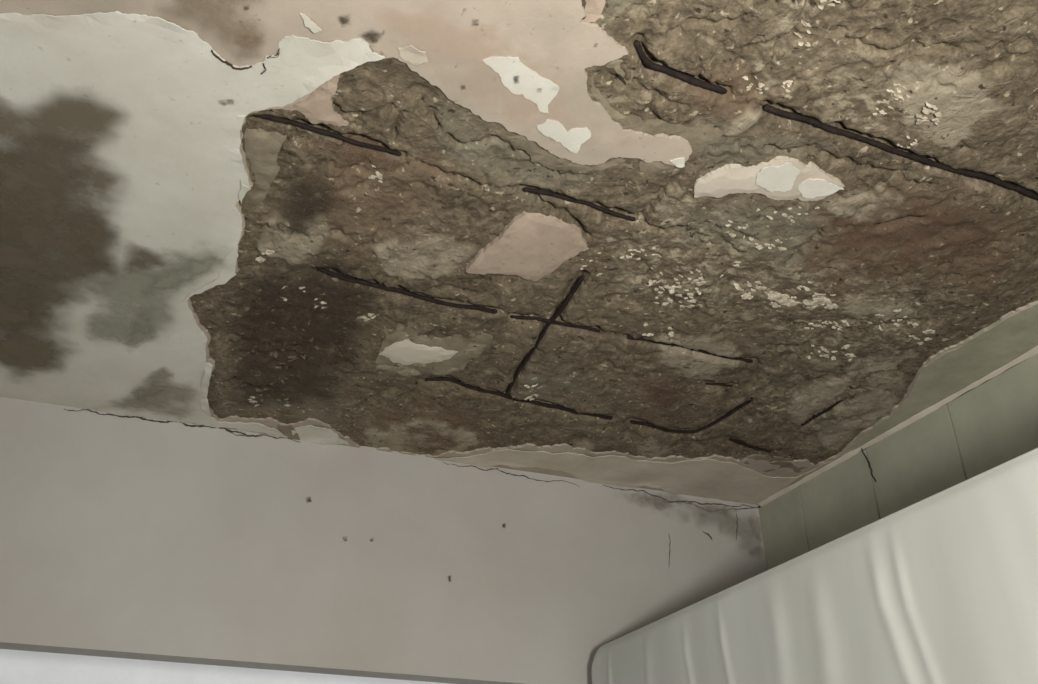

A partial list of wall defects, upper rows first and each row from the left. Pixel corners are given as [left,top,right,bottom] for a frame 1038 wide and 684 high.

damp [0,98,217,371]
spalling [0,0,1038,473]
damp [120,369,189,415]
crack [65,409,298,442]